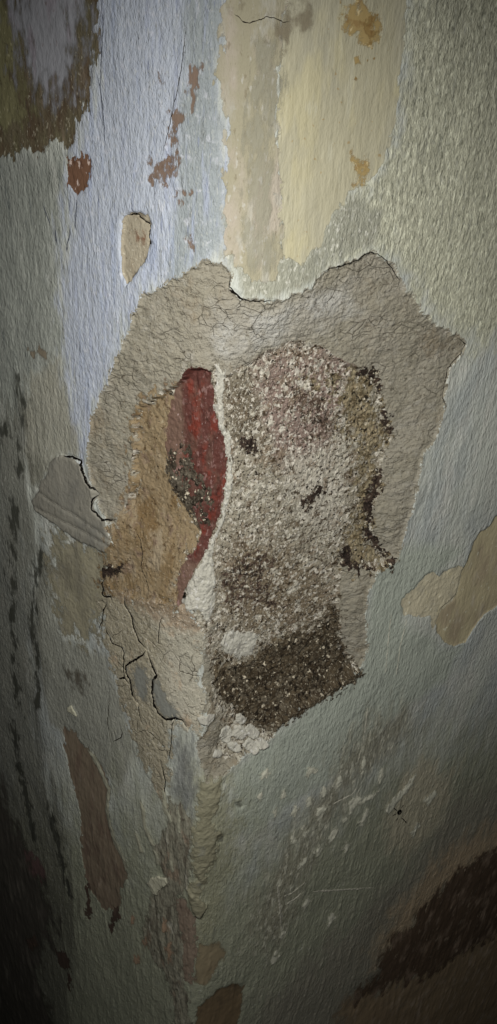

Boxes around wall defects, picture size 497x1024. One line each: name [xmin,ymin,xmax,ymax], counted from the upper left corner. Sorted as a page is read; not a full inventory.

peeling [0,0,105,250]
spalling [42,0,467,784]
crack [64,455,149,588]
peeling [401,516,497,646]
crack [99,580,198,792]
leakage [206,595,369,741]
peeling [273,773,343,845]
peeling [297,768,384,870]
leakage [108,907,121,933]
leakage [338,846,497,1024]